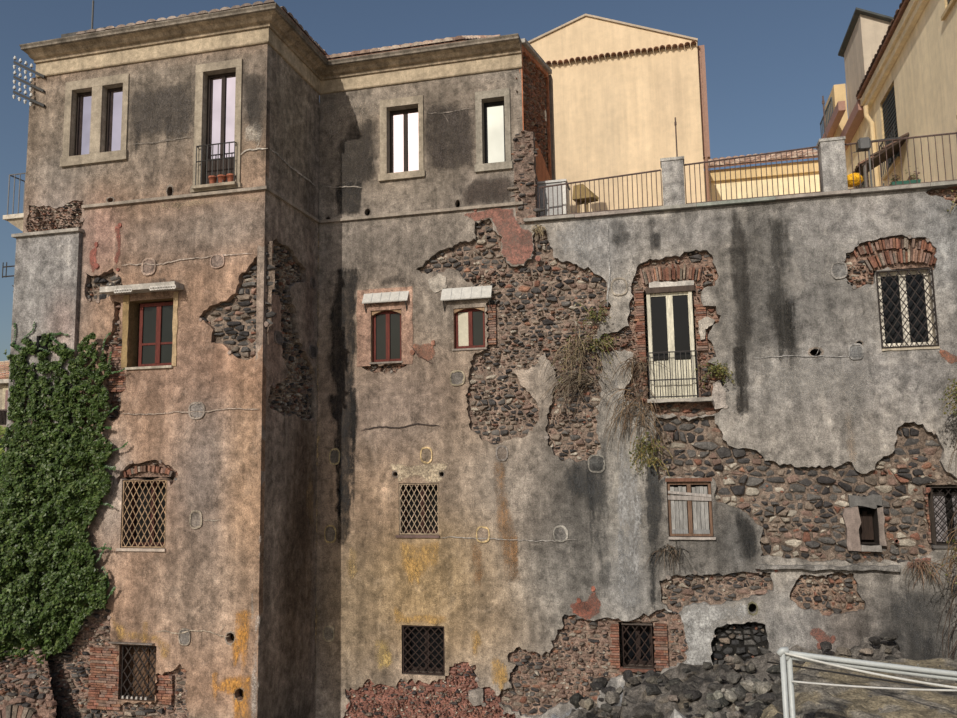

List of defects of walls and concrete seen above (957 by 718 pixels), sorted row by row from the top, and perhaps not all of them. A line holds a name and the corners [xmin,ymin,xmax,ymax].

spalling [26,201,84,232]
damp [326,103,375,215]
spalling [926,186,957,204]
spalling [199,241,314,423]
damp [328,269,359,544]
spalling [364,340,435,373]
crack [361,423,438,431]
spalling [419,198,957,617]
spalling [47,608,189,718]
spalling [344,569,787,718]